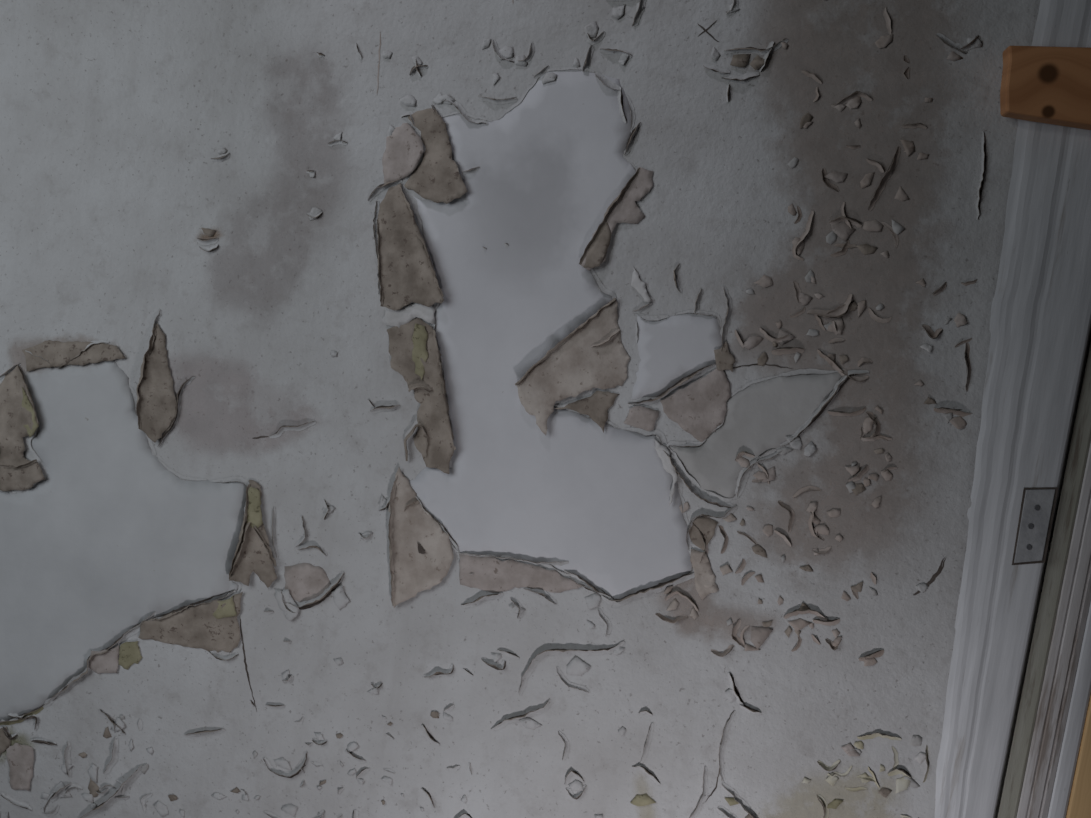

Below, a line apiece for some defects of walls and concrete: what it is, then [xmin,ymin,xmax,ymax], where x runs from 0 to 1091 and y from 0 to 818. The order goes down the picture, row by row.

peeling [608,0,646,27]
peeling [697,0,789,102]
peeling [377,21,897,696]
peeling [0,309,350,818]
crack [184,729,225,738]
peeling [253,733,370,787]
peeling [421,704,455,746]
crack [618,710,654,765]
crack [705,673,761,818]